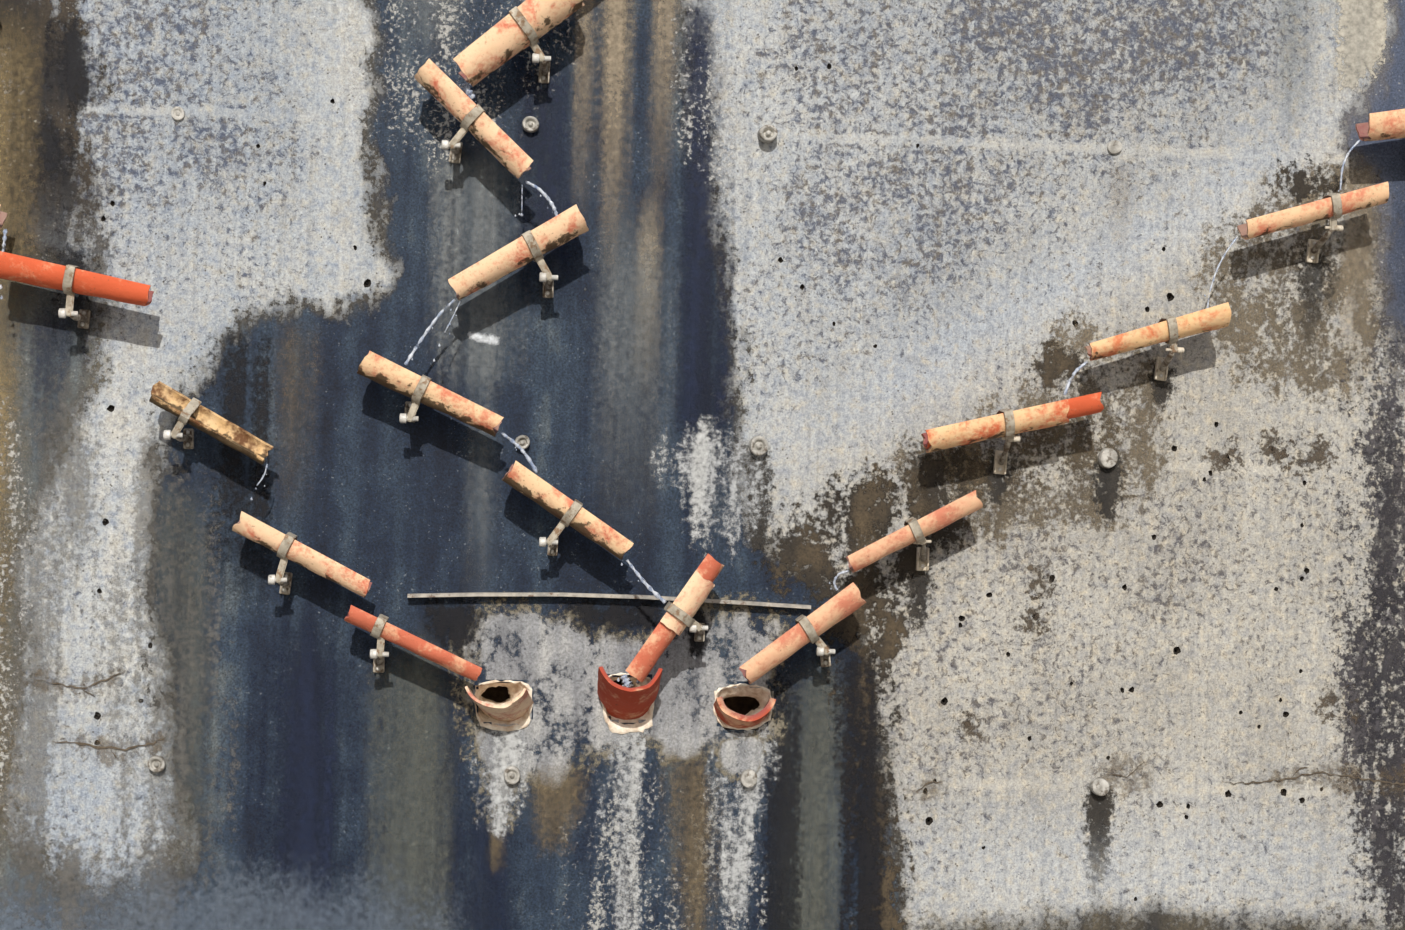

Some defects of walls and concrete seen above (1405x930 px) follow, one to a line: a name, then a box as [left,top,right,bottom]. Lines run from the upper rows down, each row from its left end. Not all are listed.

water stain [0,0,937,930]
water stain [888,0,1405,930]
crack [1230,732,1405,785]